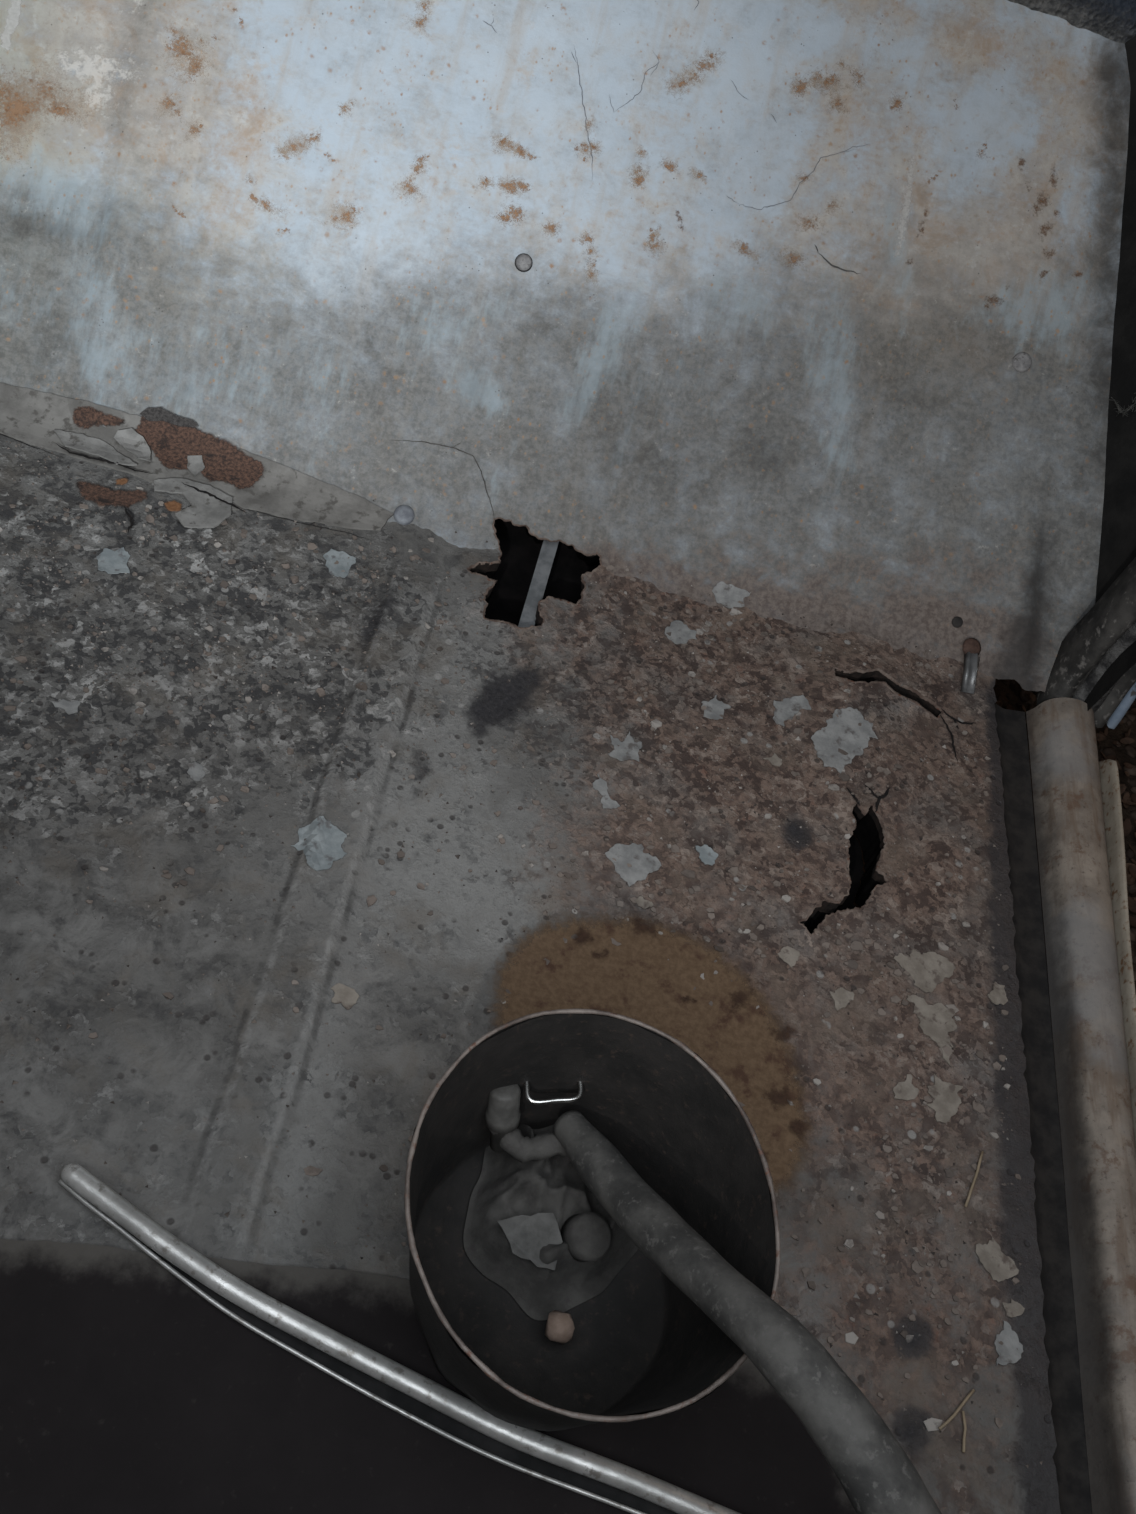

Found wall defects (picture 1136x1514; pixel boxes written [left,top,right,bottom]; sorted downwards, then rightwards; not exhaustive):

rust [0,79,76,137]
rust [793,63,863,113]
rust [482,179,528,222]
rust [1034,176,1058,278]
peeling [54,406,264,533]
spalling [469,519,600,626]
crack [833,667,974,762]